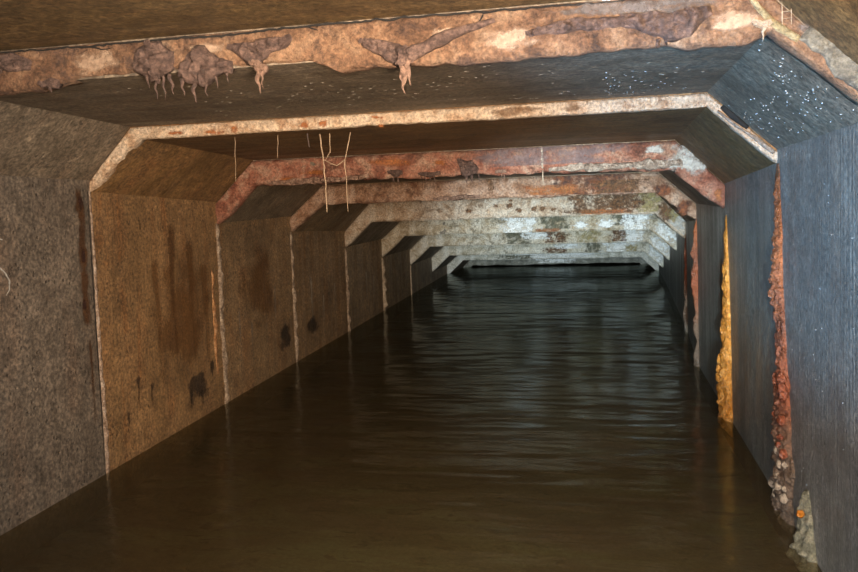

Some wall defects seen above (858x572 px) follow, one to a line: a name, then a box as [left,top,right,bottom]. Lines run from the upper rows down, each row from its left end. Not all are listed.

water stain [89,191,110,480]
water stain [216,223,230,409]
water stain [767,163,818,572]